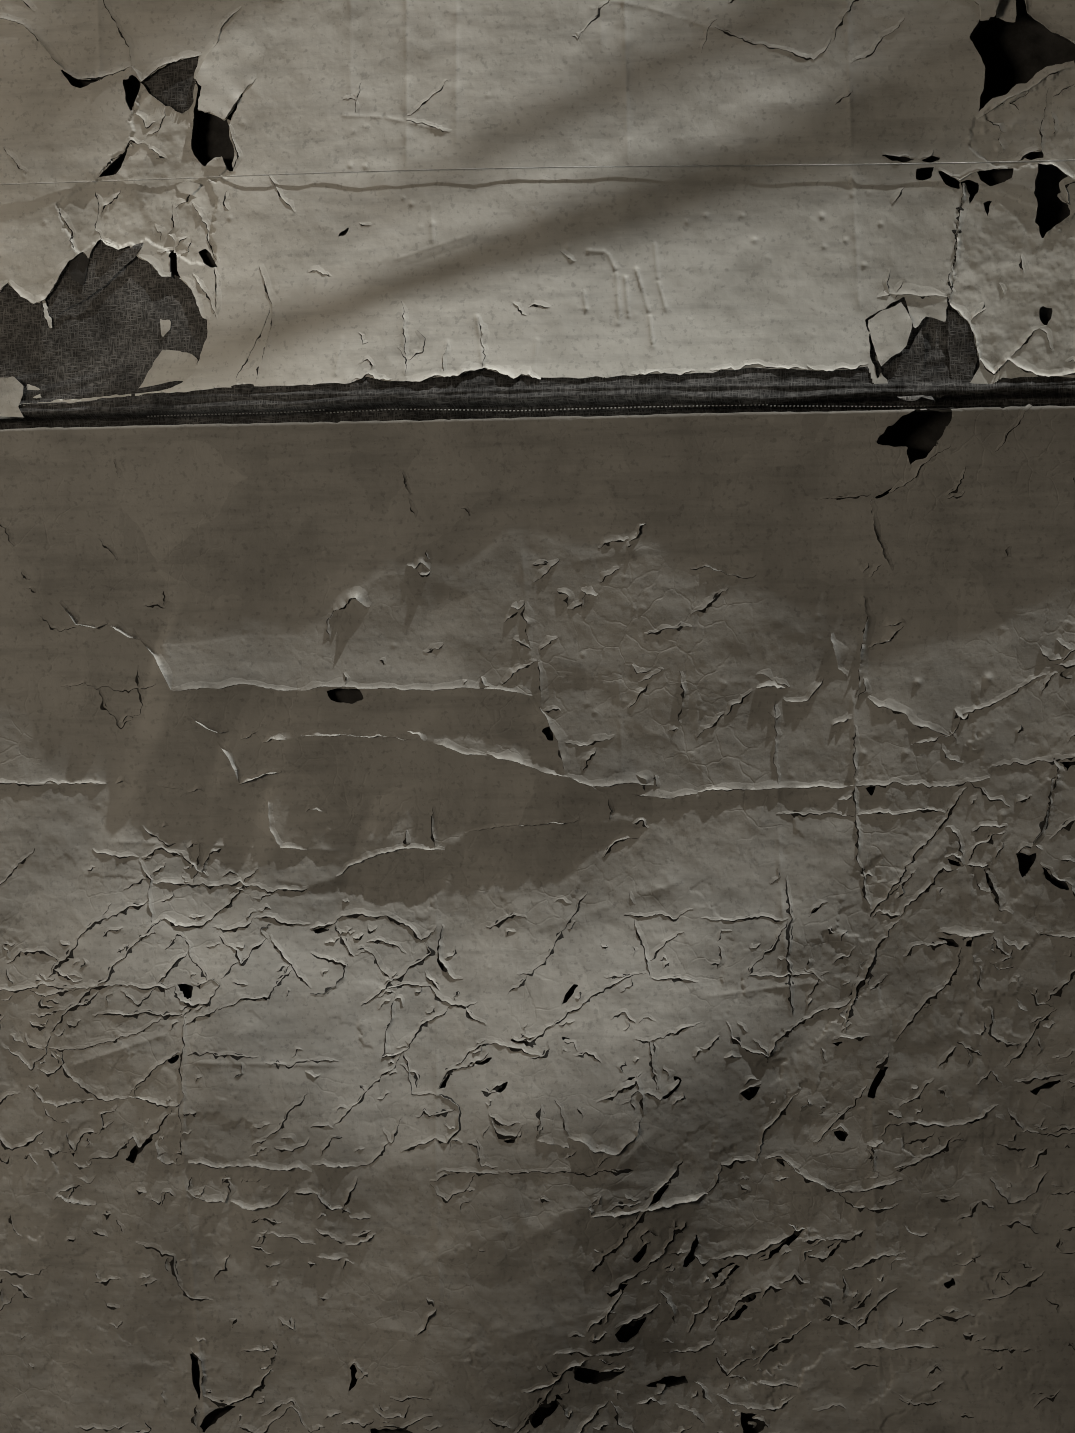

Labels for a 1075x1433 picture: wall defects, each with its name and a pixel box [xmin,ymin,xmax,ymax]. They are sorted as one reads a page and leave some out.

crack [700,0,904,105]
peeling [154,23,265,319]
spalling [882,0,1075,238]
crack [308,222,372,277]
peeling [0,376,41,420]
peeling [139,319,198,389]
crack [358,301,426,375]
peeling [866,296,948,376]
crack [500,558,620,685]
crack [543,561,756,772]
crack [0,638,1075,1433]
peeling [0,1015,686,1286]